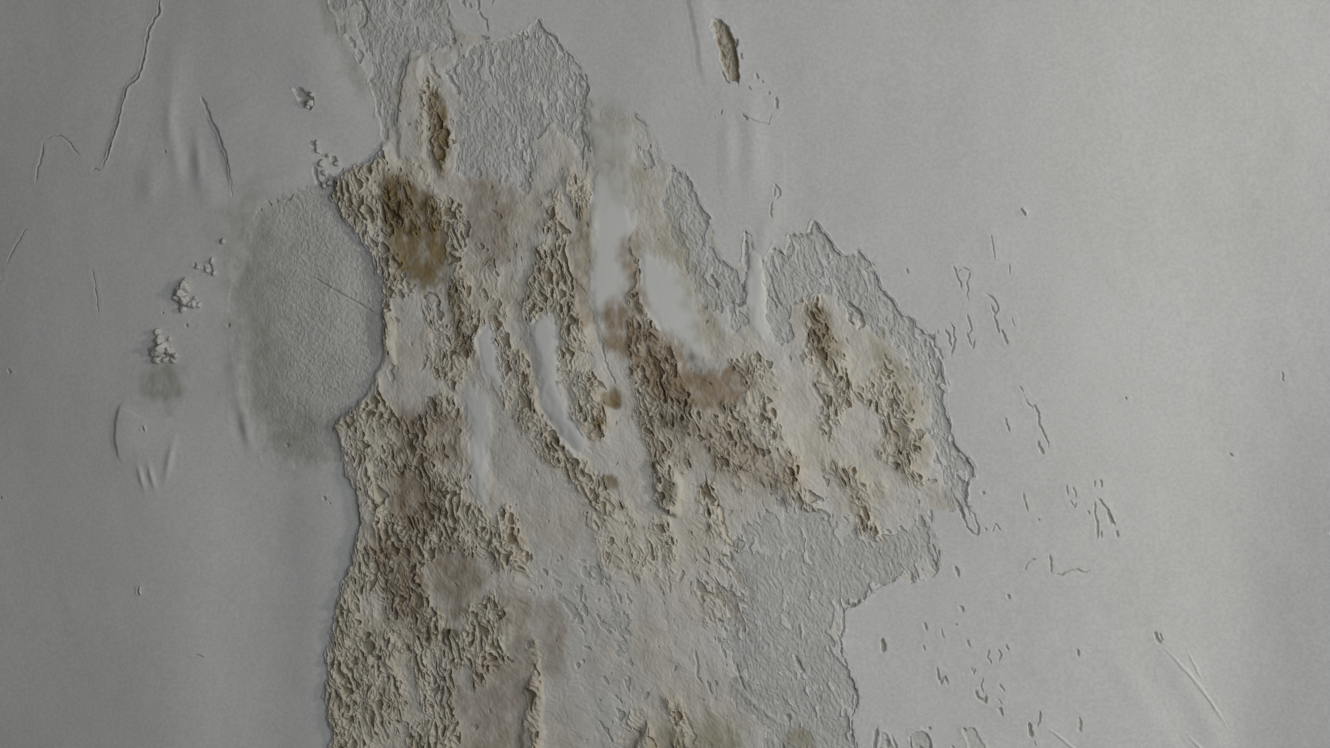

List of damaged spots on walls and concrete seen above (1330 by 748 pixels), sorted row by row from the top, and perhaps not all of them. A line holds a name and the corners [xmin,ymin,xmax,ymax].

crack [30,0,168,188]
crack [193,88,239,204]
crack [86,262,104,322]
spalling [148,328,179,364]
peeling [166,0,1056,748]
damp [605,308,739,410]
crack [1018,549,1097,582]